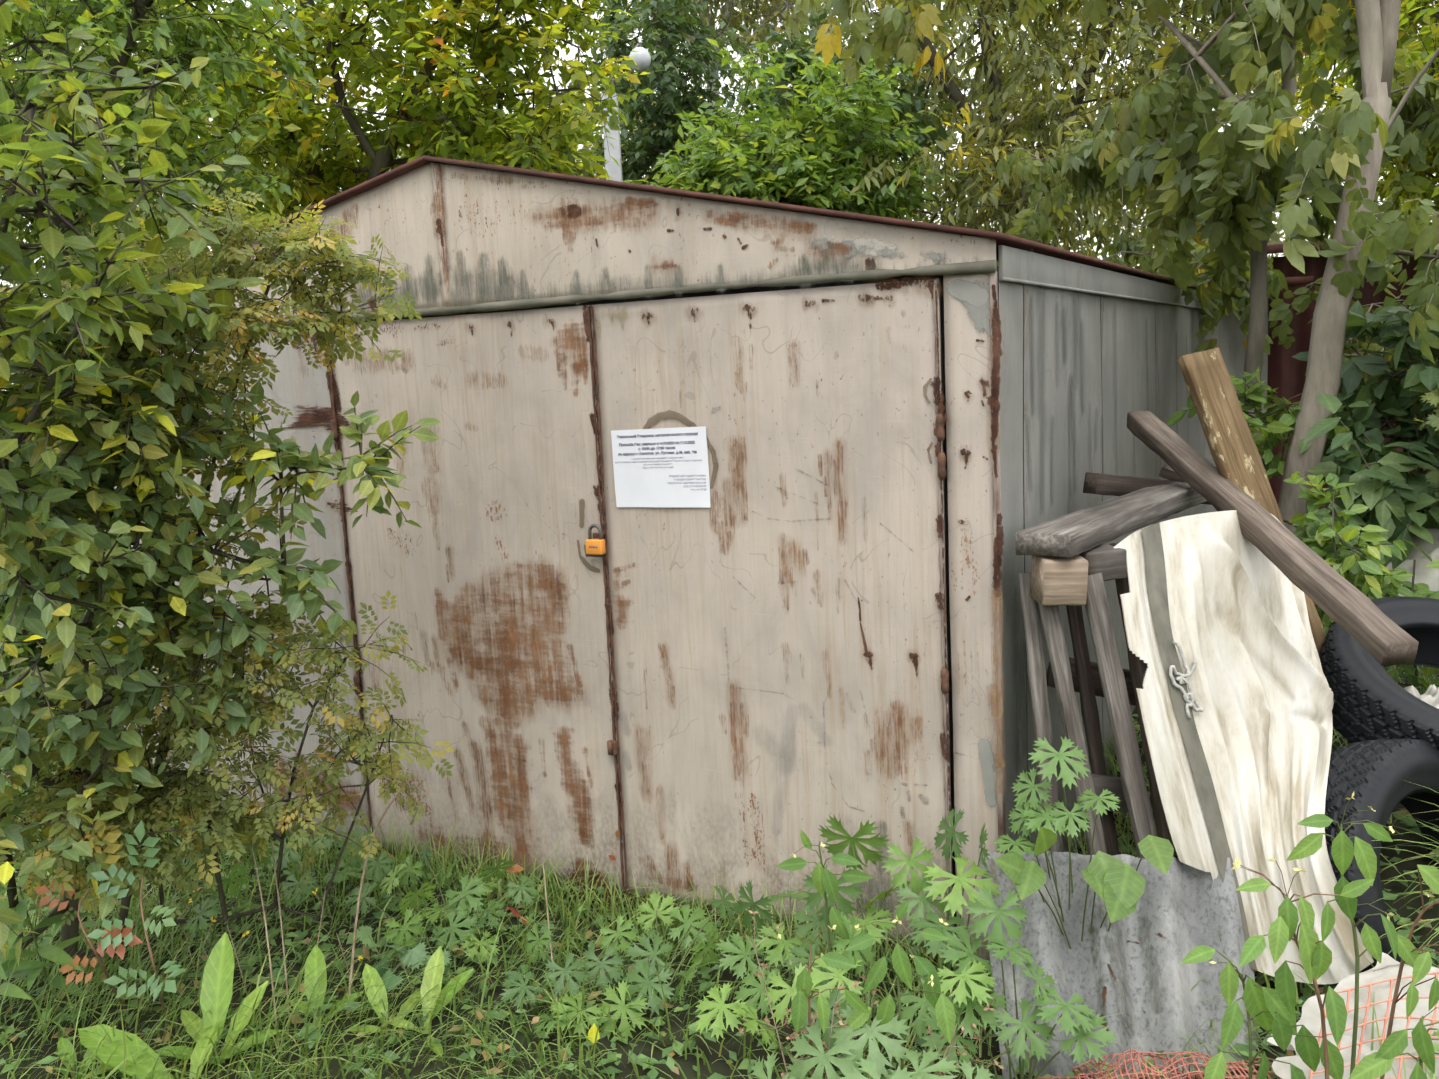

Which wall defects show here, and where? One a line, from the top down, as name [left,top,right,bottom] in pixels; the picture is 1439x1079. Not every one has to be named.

corrosion [434,168,653,282]
corrosion [709,213,813,269]
corrosion [858,258,947,457]
corrosion [964,378,989,406]
corrosion [710,439,747,548]
corrosion [817,442,846,532]
corrosion [426,538,582,863]
corrosion [549,305,634,908]
corrosion [779,545,807,584]
corrosion [874,702,922,775]
corrosion [935,480,977,812]